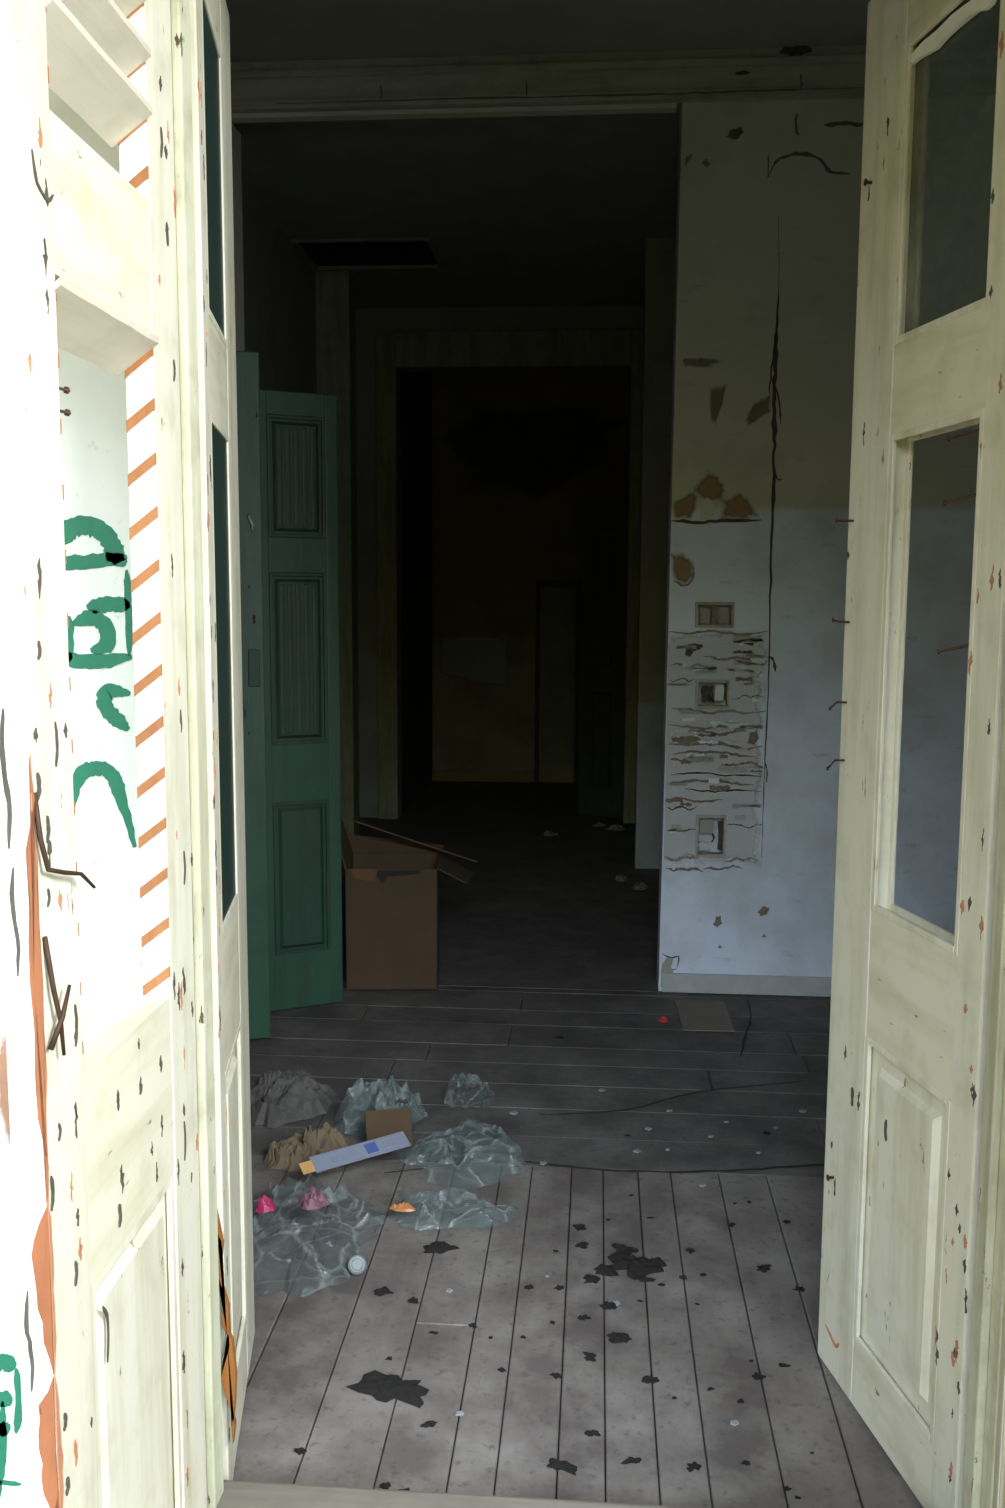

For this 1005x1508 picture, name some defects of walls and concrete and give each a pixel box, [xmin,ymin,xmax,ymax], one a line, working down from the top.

peeling [664,630,768,872]
crack [761,285,782,858]